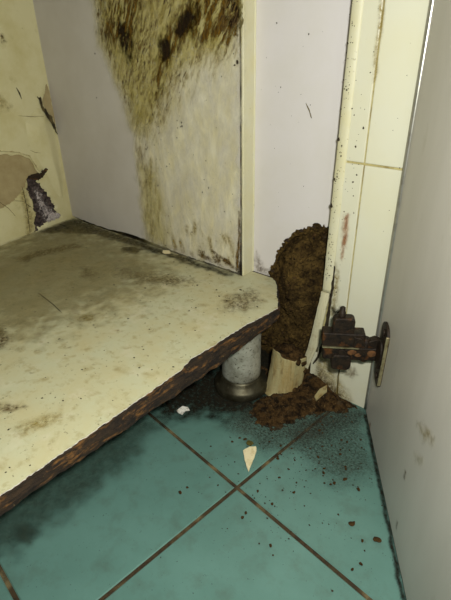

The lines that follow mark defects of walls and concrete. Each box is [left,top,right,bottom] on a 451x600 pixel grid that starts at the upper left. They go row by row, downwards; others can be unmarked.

peeling [0,151,61,231]
damp [95,0,240,268]